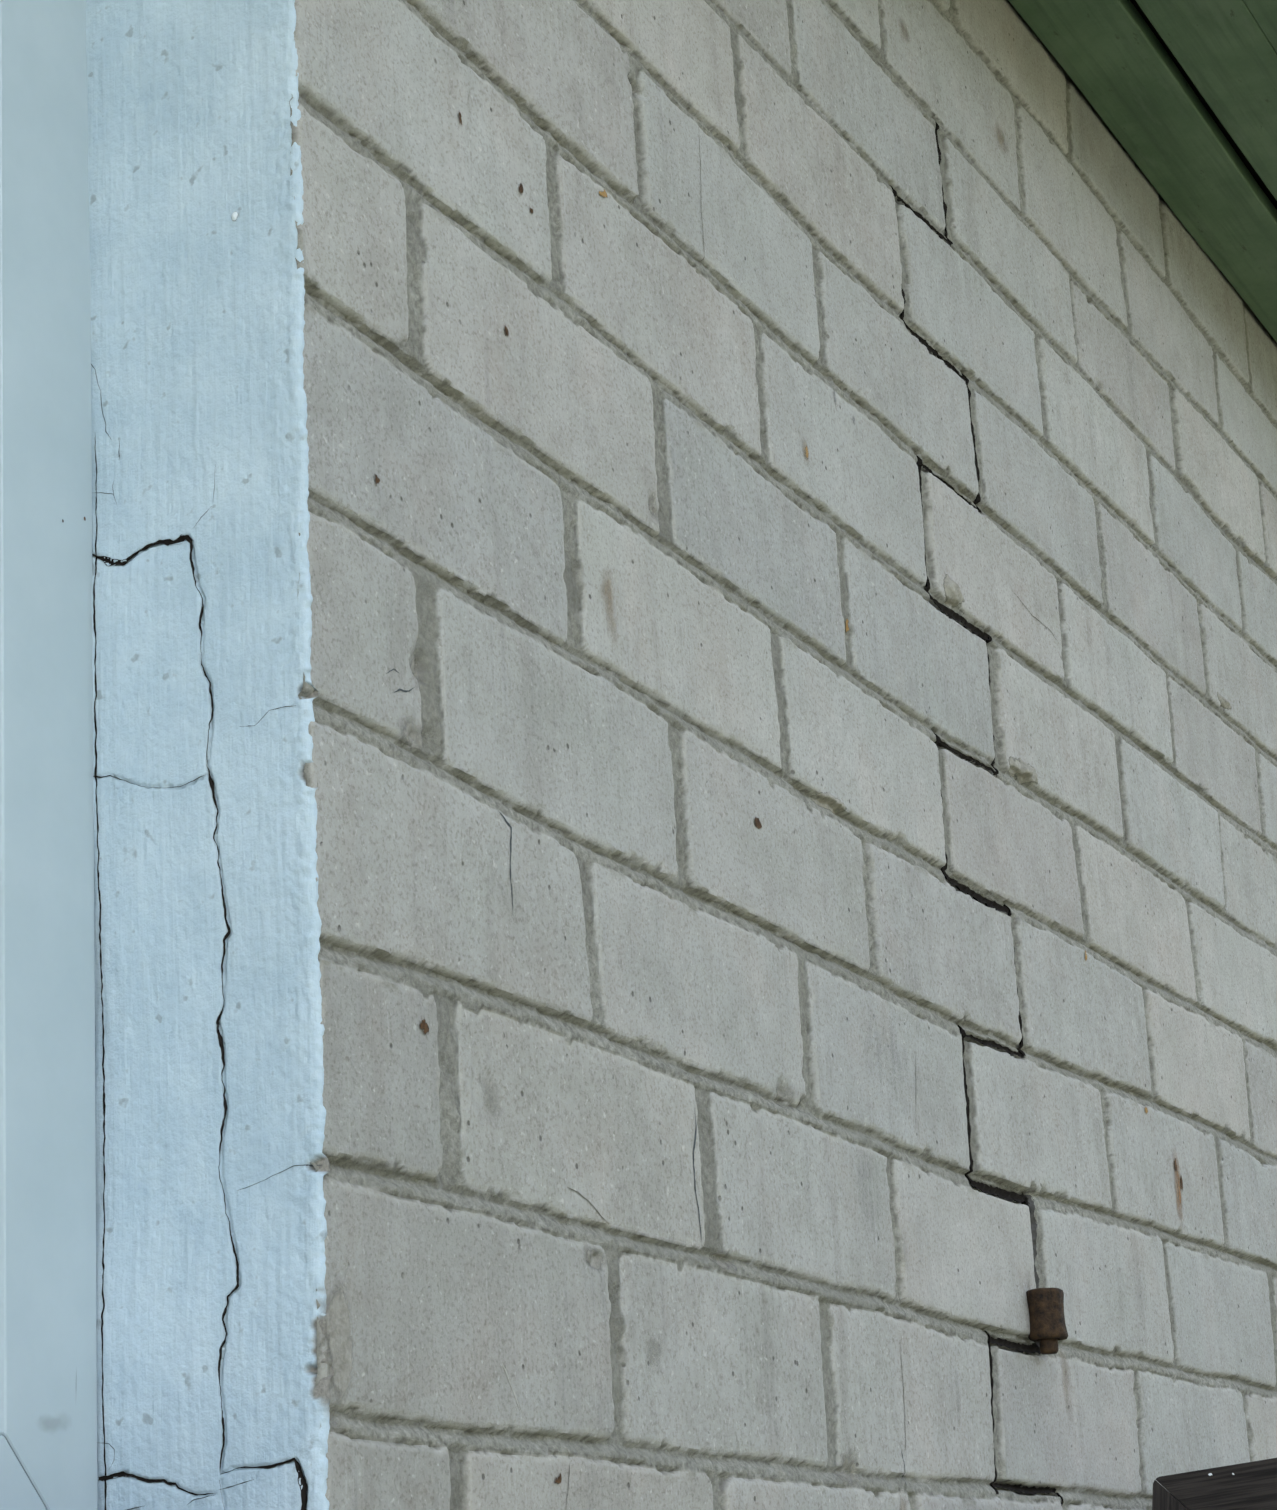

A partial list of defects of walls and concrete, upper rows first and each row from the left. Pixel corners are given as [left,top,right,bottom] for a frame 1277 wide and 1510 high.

crack [889,123,953,247]
crack [900,287,992,686]
crack [91,364,321,1510]
crack [934,734,999,777]
crack [941,852,1039,1288]
crack [984,1331,1064,1506]